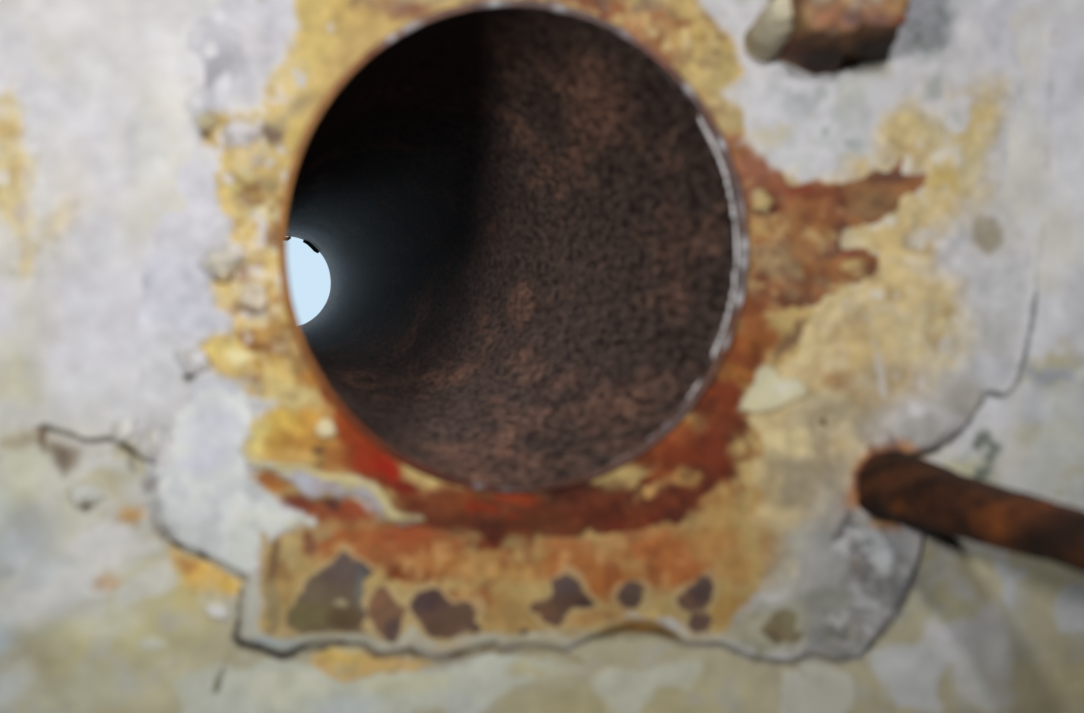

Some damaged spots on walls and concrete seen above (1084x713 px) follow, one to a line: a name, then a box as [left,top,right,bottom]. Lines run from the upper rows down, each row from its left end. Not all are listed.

corrosion [190,0,1084,685]
peeling [735,361,810,416]
corrosion [163,544,241,602]
peeling [112,383,426,615]
peeling [163,543,720,713]
crack [31,419,915,694]
peeling [991,555,1033,614]